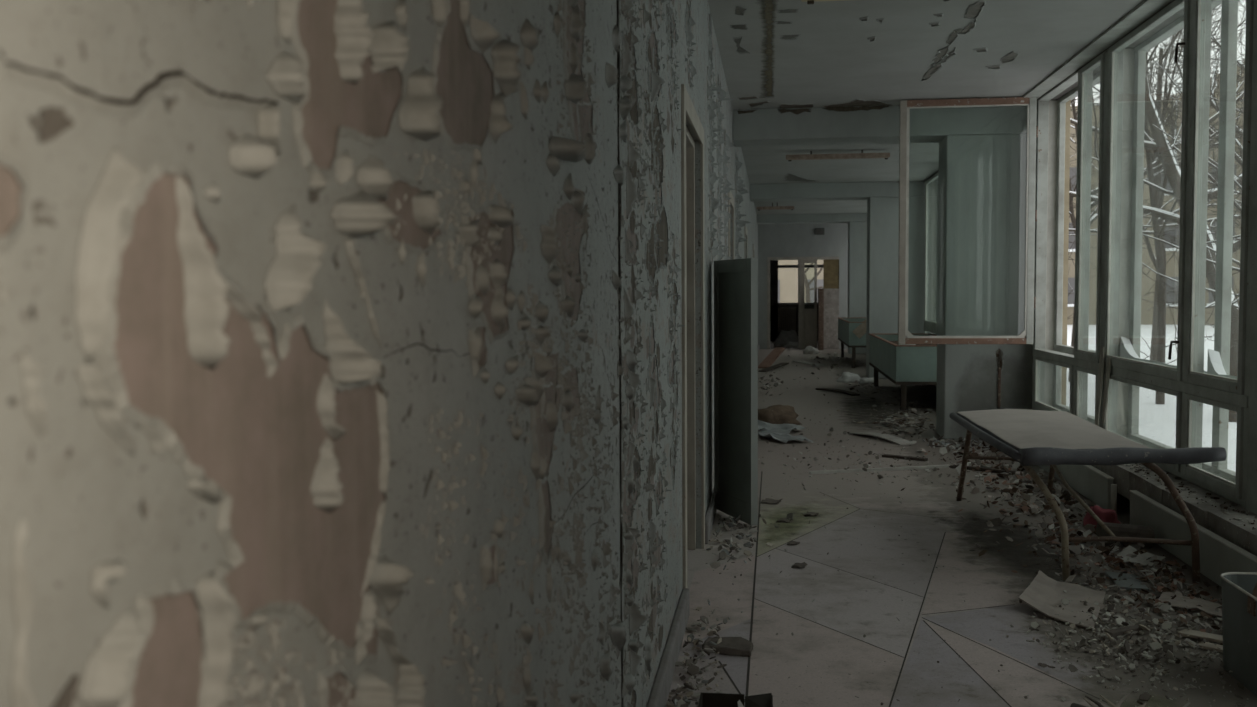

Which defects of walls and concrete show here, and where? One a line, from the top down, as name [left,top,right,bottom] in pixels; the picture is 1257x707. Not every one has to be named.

crack [0,49,278,118]
spalling [922,0,985,81]
peeling [973,47,1019,69]
peeling [0,154,29,252]
peeling [229,0,896,707]
peeling [75,146,428,707]